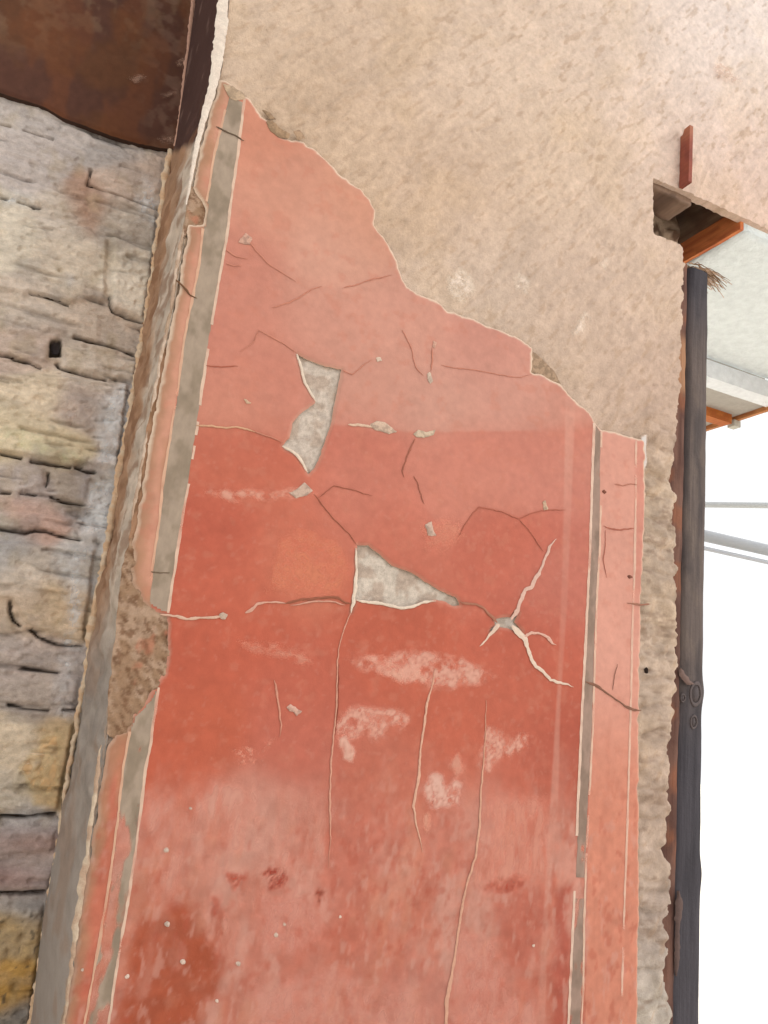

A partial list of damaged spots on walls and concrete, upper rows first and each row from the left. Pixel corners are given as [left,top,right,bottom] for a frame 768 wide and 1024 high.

flaking render [282,354,341,498]
flaking render [531,351,561,385]
flaking render [107,345,170,738]
crack [160,596,353,866]
damp [337,707,408,760]
flaking render [351,545,458,612]
damp [359,652,482,687]
crack [412,668,436,852]
damp [425,755,461,825]
damp [485,728,526,771]
crack [458,506,641,711]
crack [444,703,487,1024]